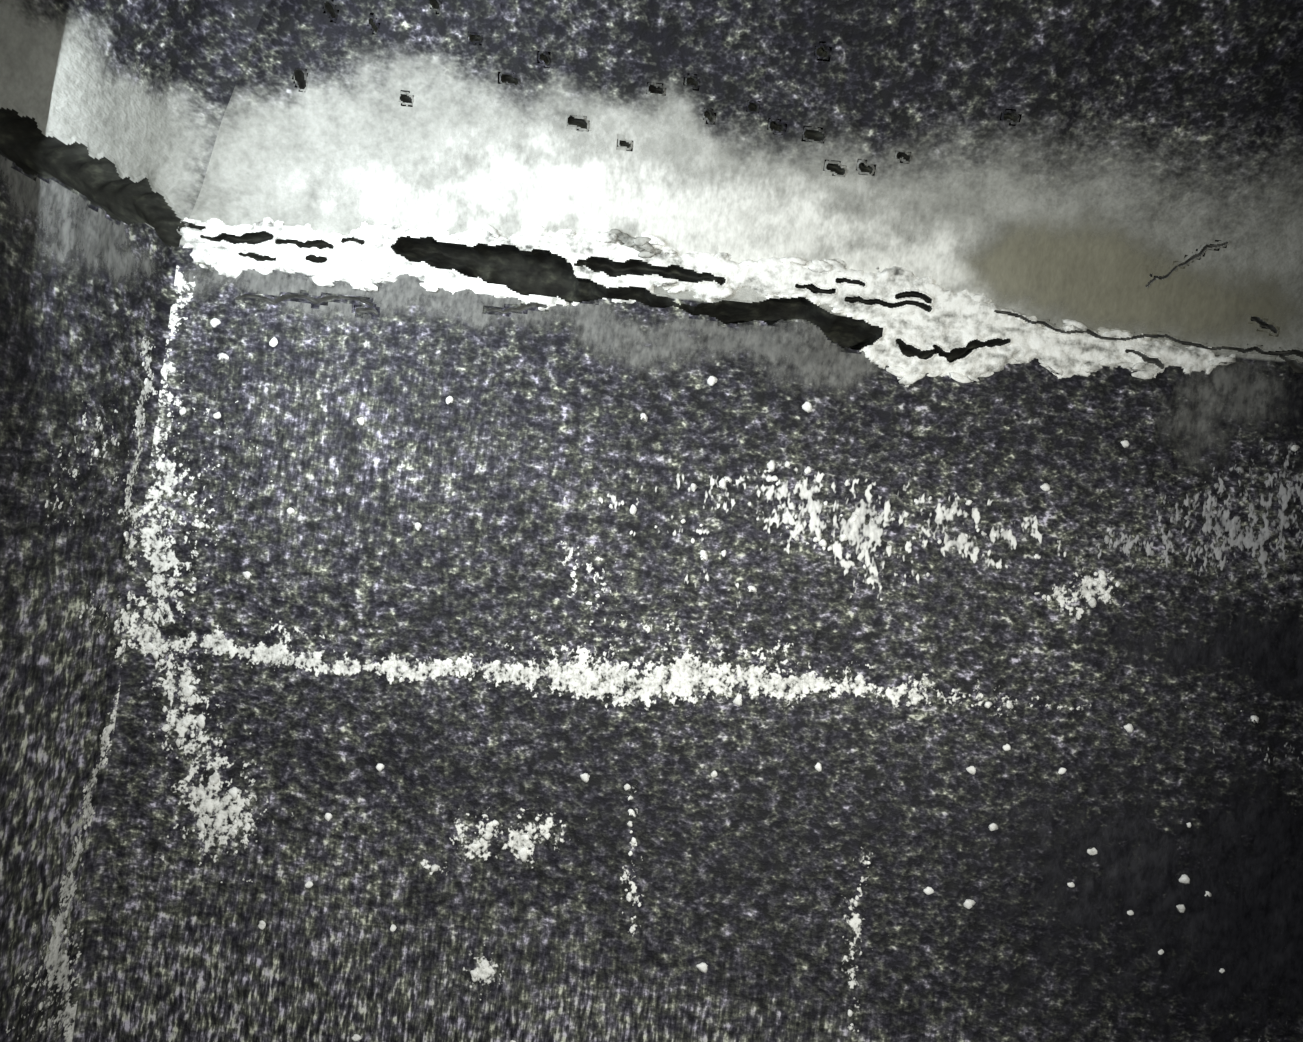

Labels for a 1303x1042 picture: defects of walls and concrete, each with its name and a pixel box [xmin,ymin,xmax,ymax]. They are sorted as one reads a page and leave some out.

spalling [0,155,154,283]
spalling [294,69,306,89]
spalling [501,74,518,85]
spalling [567,115,587,129]
crack [0,102,1303,378]
spalling [826,162,873,175]
spalling [185,264,874,390]
damp [45,129,1303,868]
damp [421,859,443,875]
damp [620,784,644,936]
damp [984,739,1303,1042]
damp [463,944,504,1000]